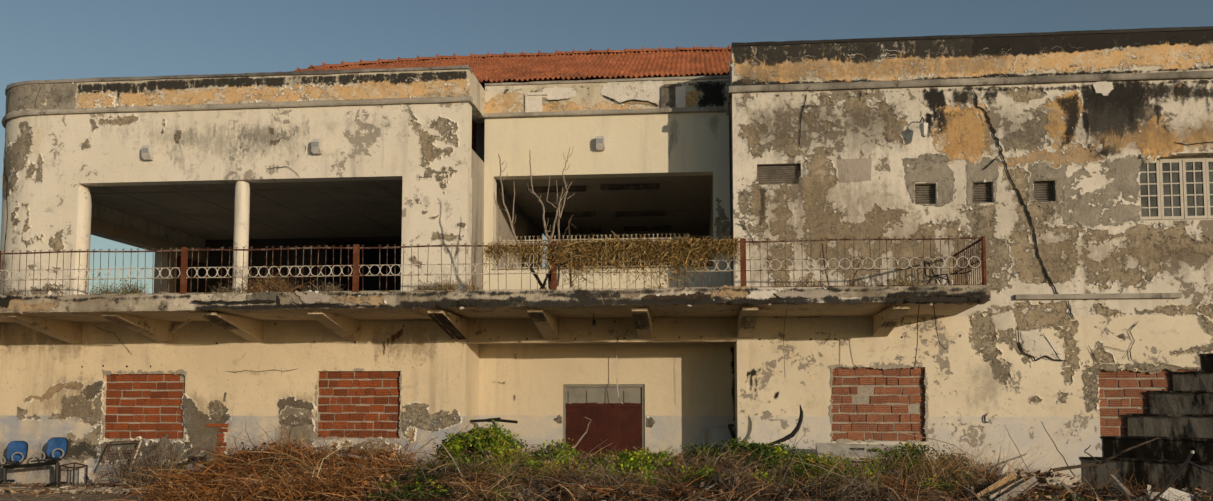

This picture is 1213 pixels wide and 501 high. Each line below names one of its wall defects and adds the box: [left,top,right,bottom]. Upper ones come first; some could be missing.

flaking render [0,121,68,314]
peeling [72,77,470,242]
peeling [484,91,525,113]
peeling [542,80,663,118]
water stain [0,30,1213,311]
flaking render [632,40,1213,412]
crack [973,90,1074,320]
flaking render [17,379,231,467]
flaking render [276,395,463,458]
crack [1017,322,1138,362]